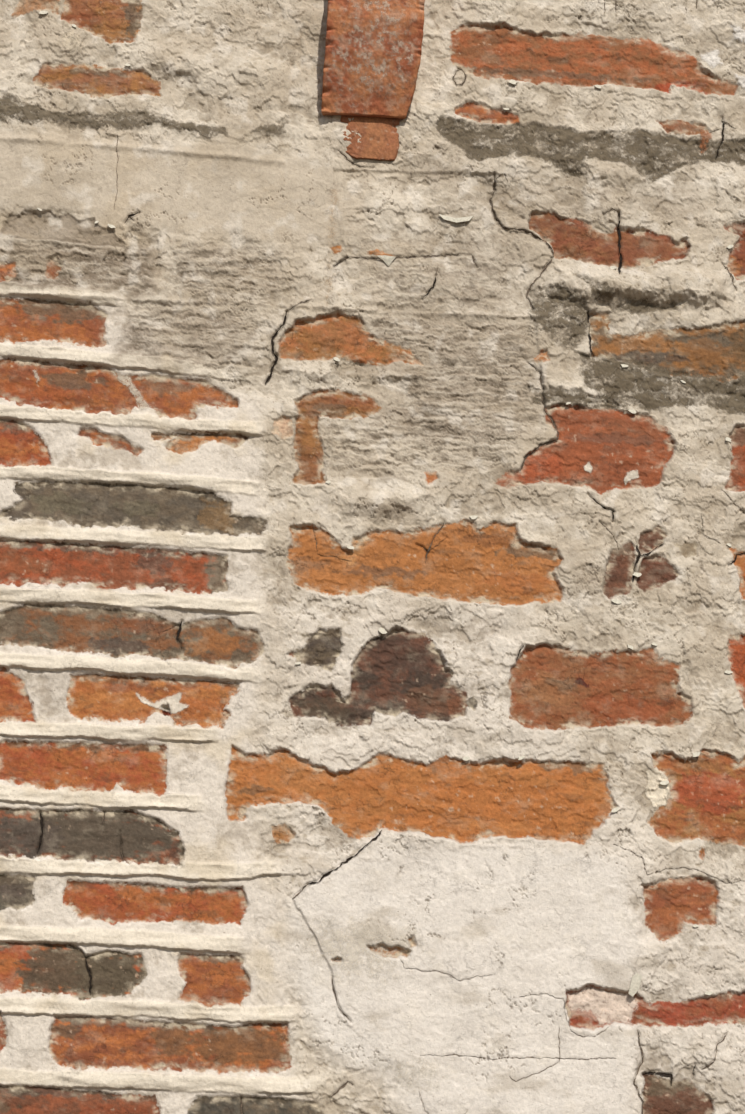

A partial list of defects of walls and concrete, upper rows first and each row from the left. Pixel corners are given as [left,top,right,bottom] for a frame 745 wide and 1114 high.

spalling [445,17,742,99]
spalling [0,205,129,251]
crack [335,254,477,298]
crack [489,173,554,308]
crack [265,300,310,384]
spalling [274,306,428,372]
spalling [271,385,387,491]
spalling [488,400,680,498]
spalling [282,515,568,610]
spalling [283,623,478,731]
spalling [219,742,623,849]
spalling [366,936,417,959]